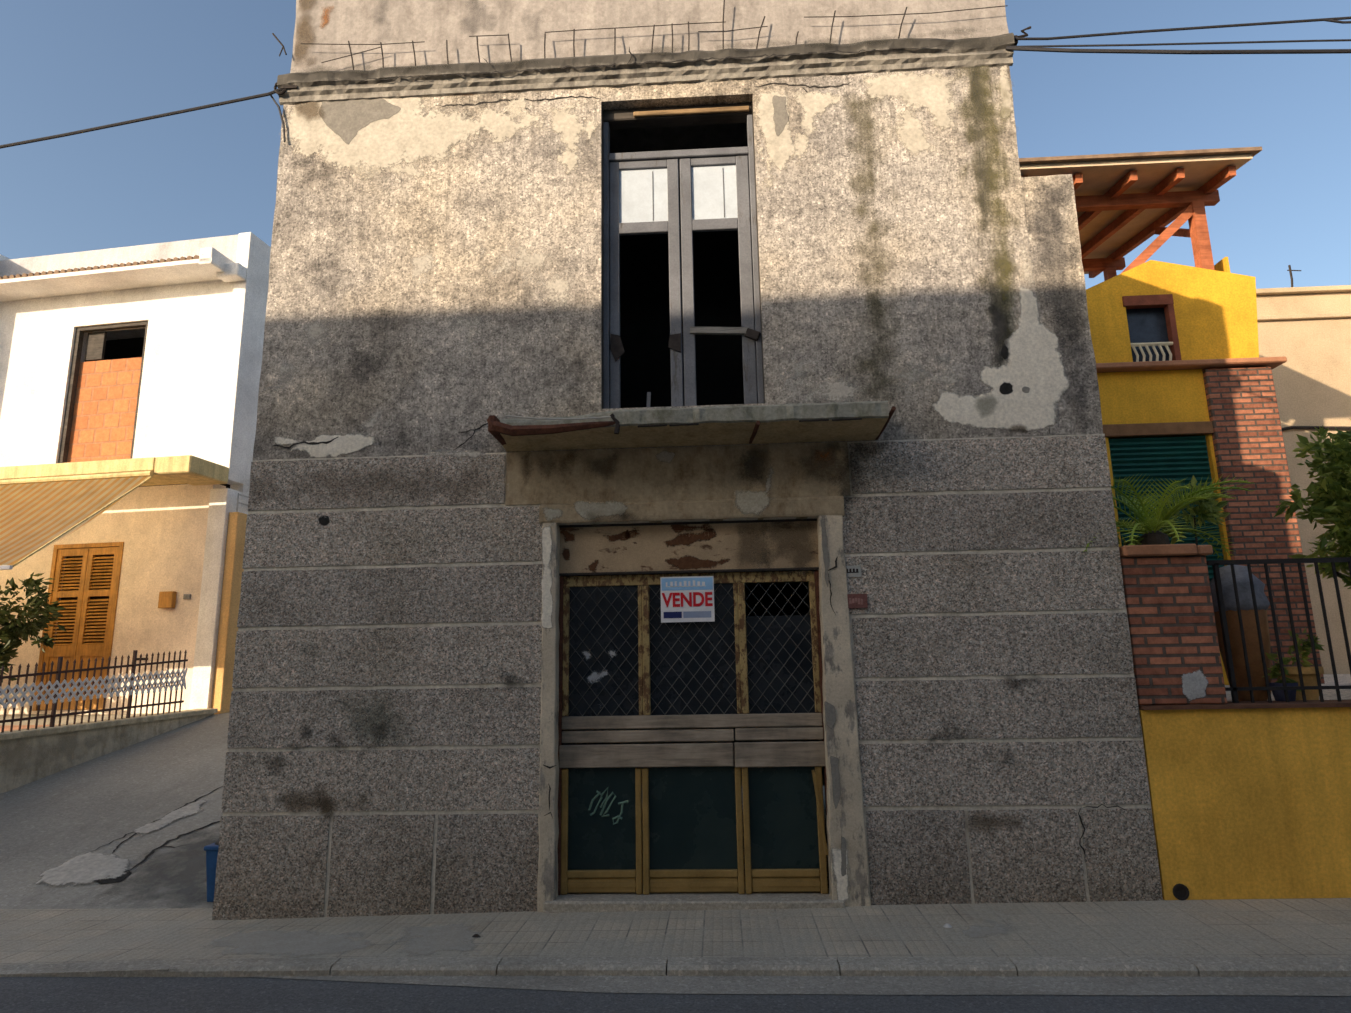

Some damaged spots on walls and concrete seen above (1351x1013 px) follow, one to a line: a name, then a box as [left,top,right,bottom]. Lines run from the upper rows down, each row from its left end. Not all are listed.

flaking render [281,97,598,179]
flaking render [910,243,1069,432]
flaking render [273,410,382,458]
crack [87,786,223,871]